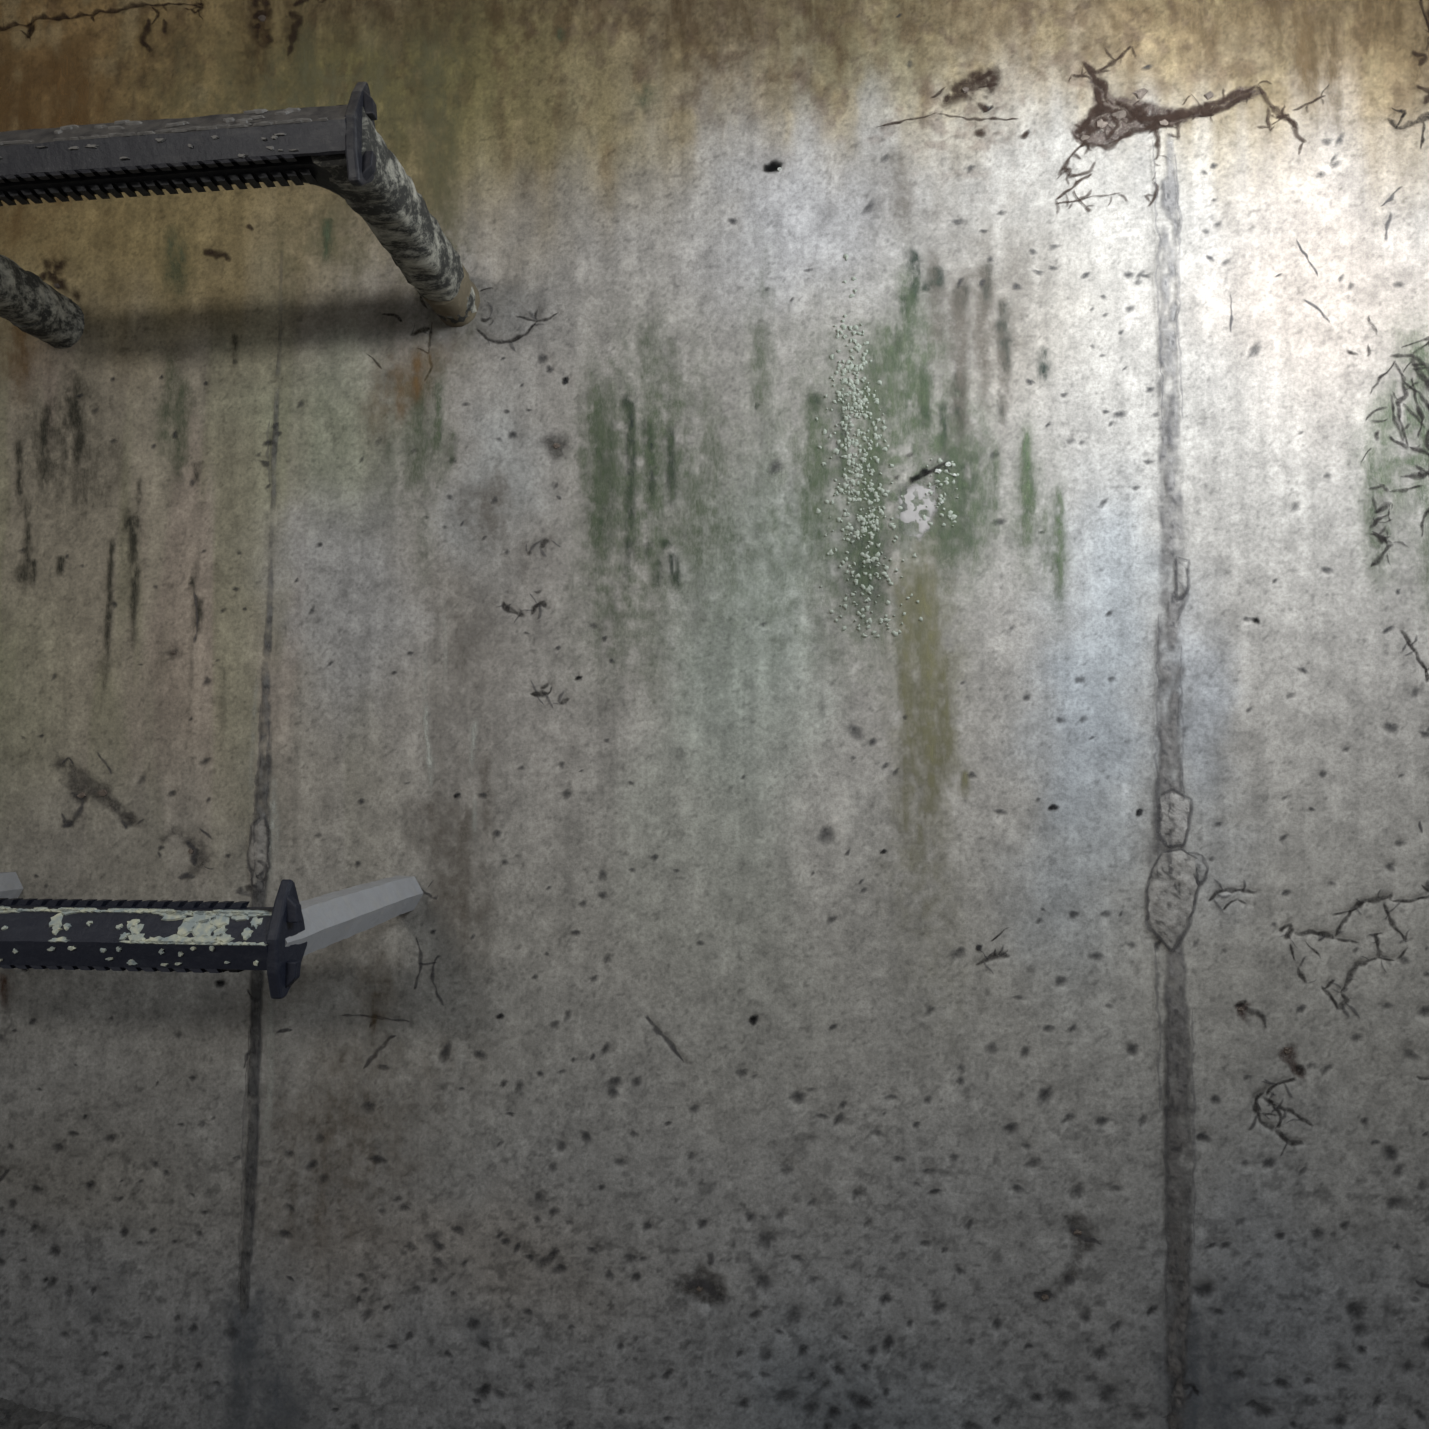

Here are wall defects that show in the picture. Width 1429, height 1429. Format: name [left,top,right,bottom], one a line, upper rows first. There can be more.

crack [0,3,203,38]
crack [1390,108,1429,147]
spalling [40,260,79,300]
spalling [204,249,230,260]
damp [105,516,139,637]
damp [622,397,679,586]
damp [807,251,1009,785]
damp [1022,433,1033,540]
damp [1055,494,1065,585]
crack [1146,789,1254,951]
crack [1279,883,1429,1017]
crack [1250,1078,1312,1155]